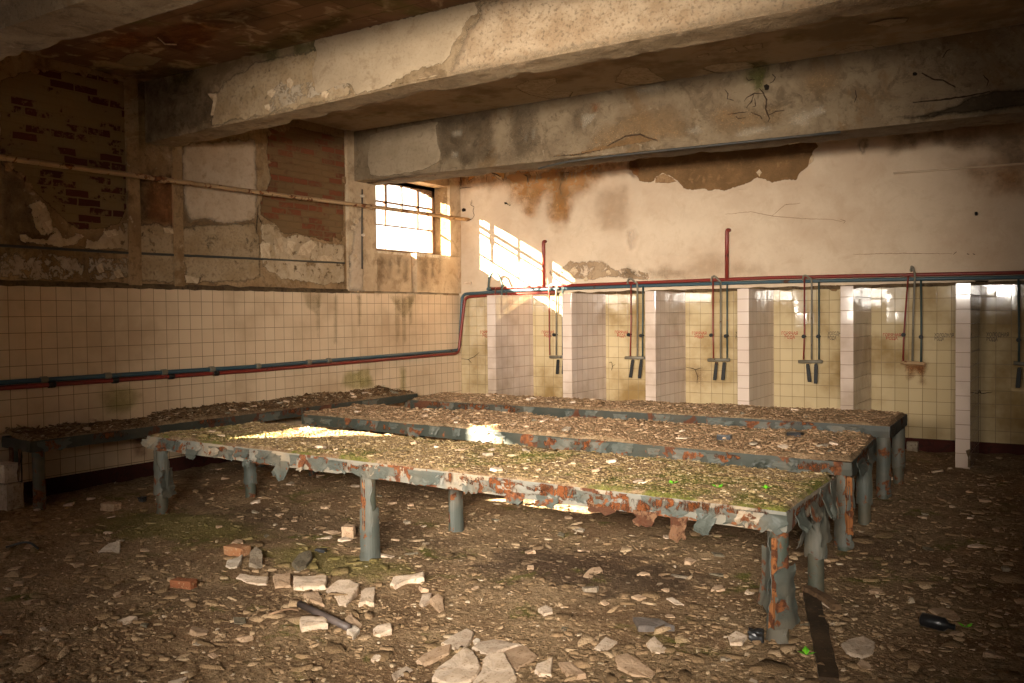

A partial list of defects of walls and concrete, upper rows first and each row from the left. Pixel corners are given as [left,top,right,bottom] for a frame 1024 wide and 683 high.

flaking render [208,2,478,125]
crack [704,69,784,121]
crack [913,49,955,87]
flaking render [0,68,128,281]
flaking render [141,125,363,291]
damp [461,162,622,219]
flaking render [629,143,818,191]